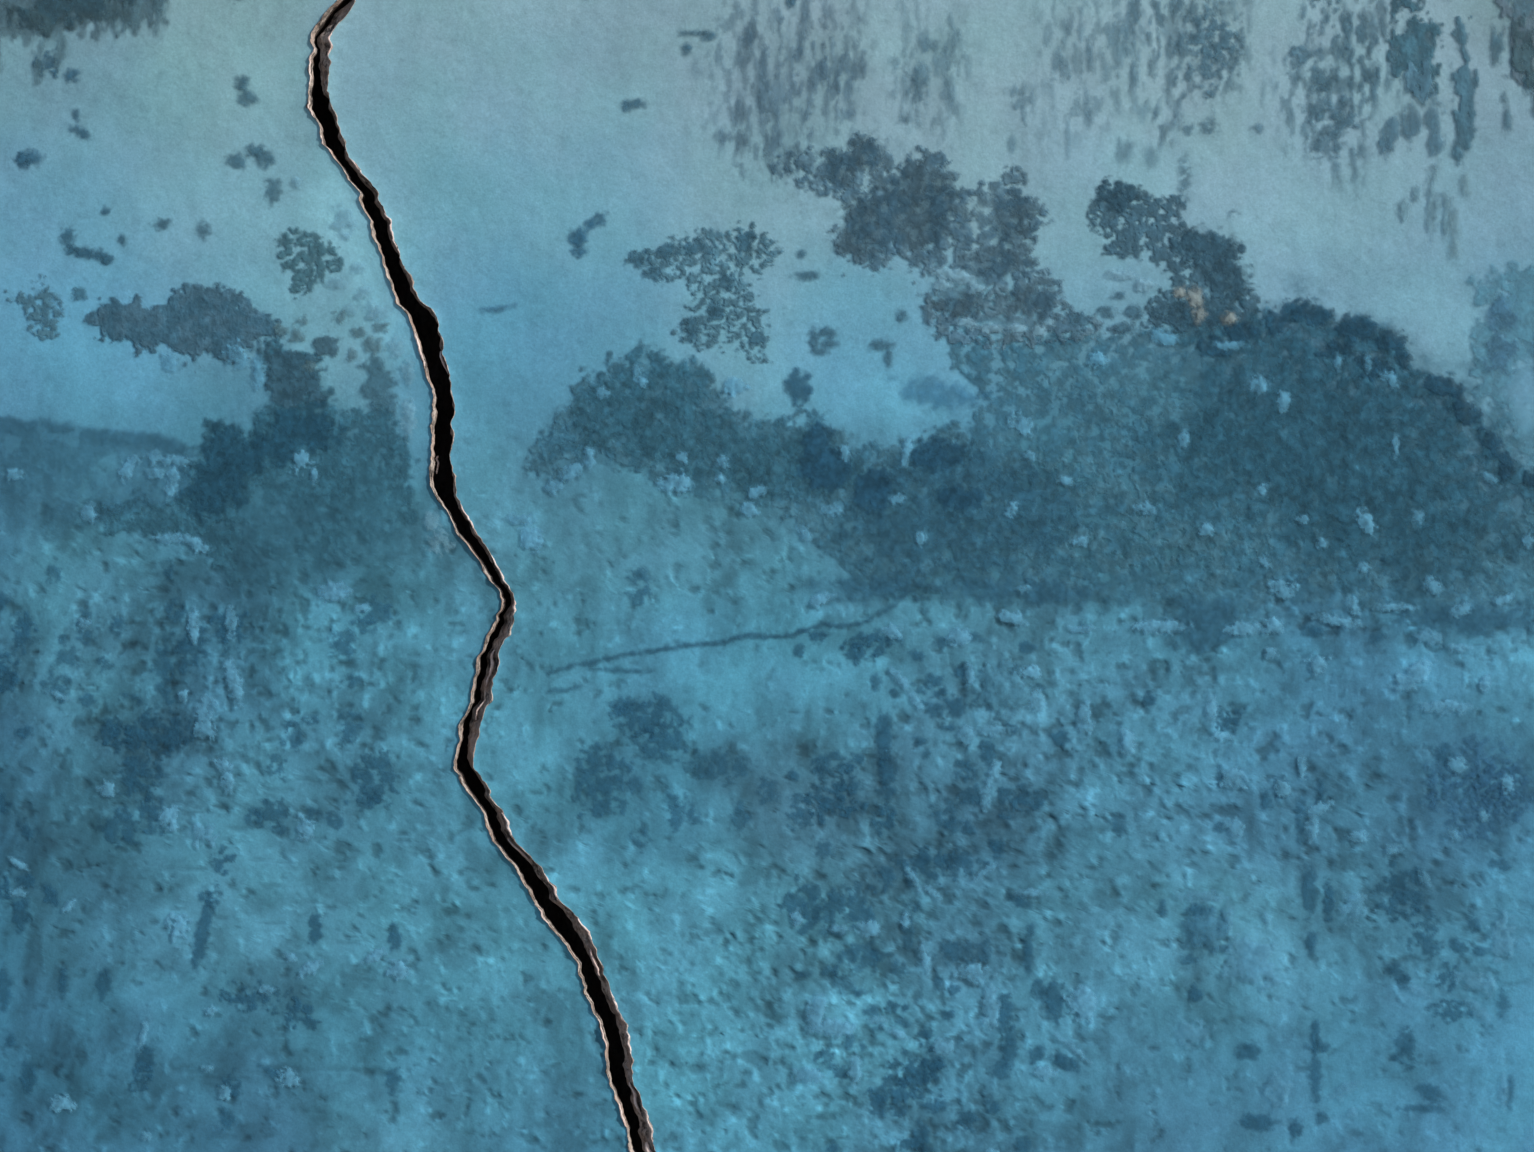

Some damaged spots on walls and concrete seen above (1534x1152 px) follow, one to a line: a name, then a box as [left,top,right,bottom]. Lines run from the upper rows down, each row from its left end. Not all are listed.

water stain [683,31,715,53]
mould [1177,1,1243,98]
mould [236,77,257,105]
water stain [624,99,643,111]
mould [228,144,280,201]
water stain [62,230,125,264]
water stain [277,227,344,299]
water stain [1,275,419,568]
water stain [524,131,1534,652]
crack [306,0,656,1152]
crack [568,607,891,668]
water stain [193,893,218,968]